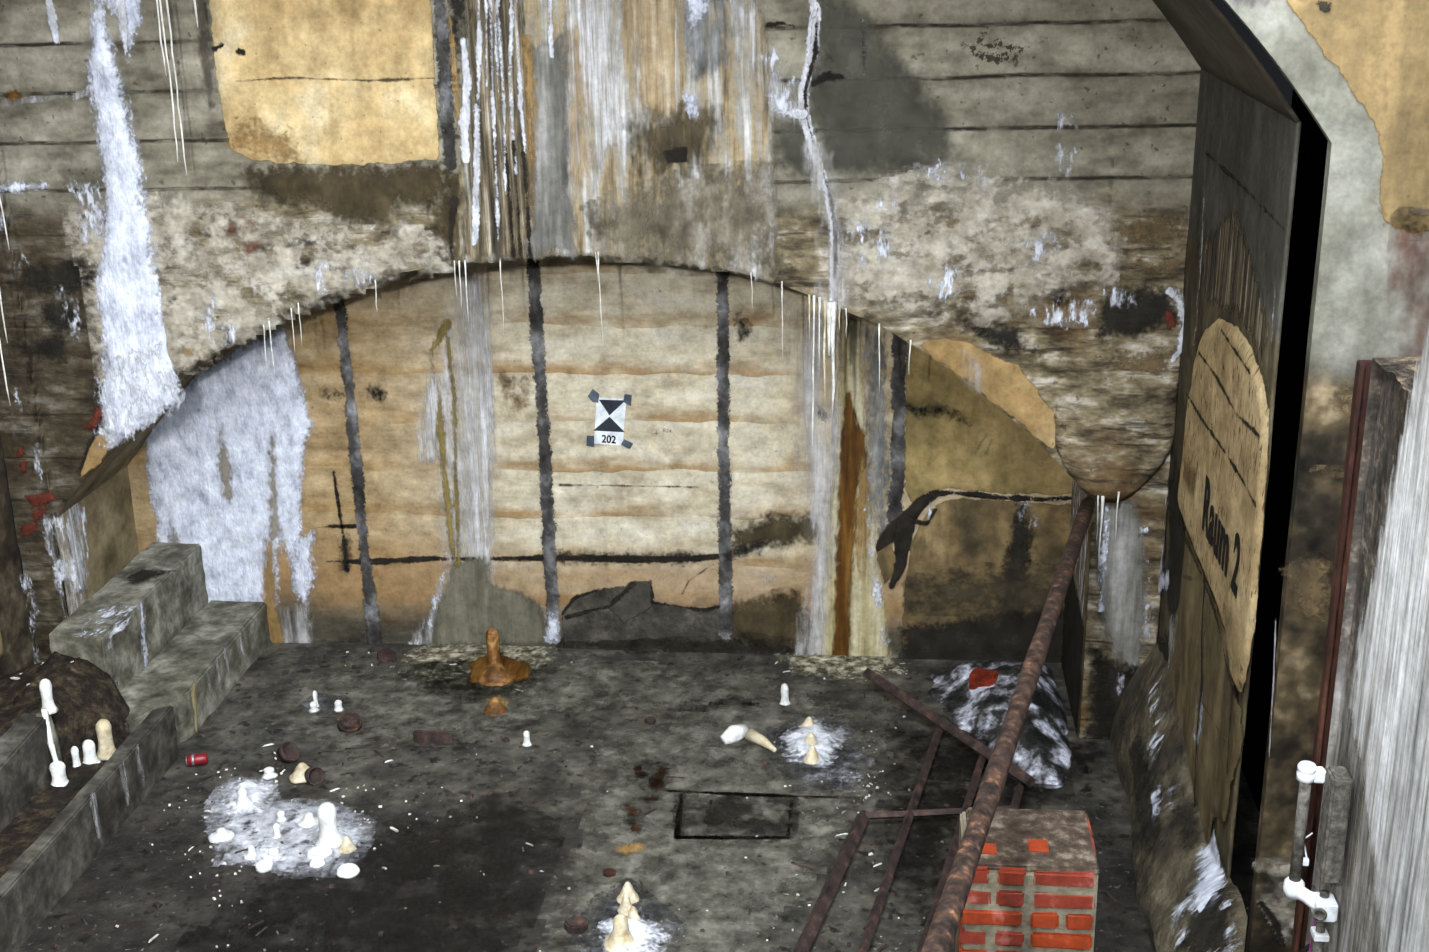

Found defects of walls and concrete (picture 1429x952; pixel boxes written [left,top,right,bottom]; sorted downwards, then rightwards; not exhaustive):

efflorescence [0,182,47,193]
efflorescence [46,0,59,43]
damp [523,36,537,168]
damp [566,0,727,189]
crack [761,0,844,306]
damp [775,0,1132,329]
efflorescence [61,0,453,643]
efflorescence [43,504,89,610]
corrosion [832,392,870,657]
crack [875,489,1072,589]